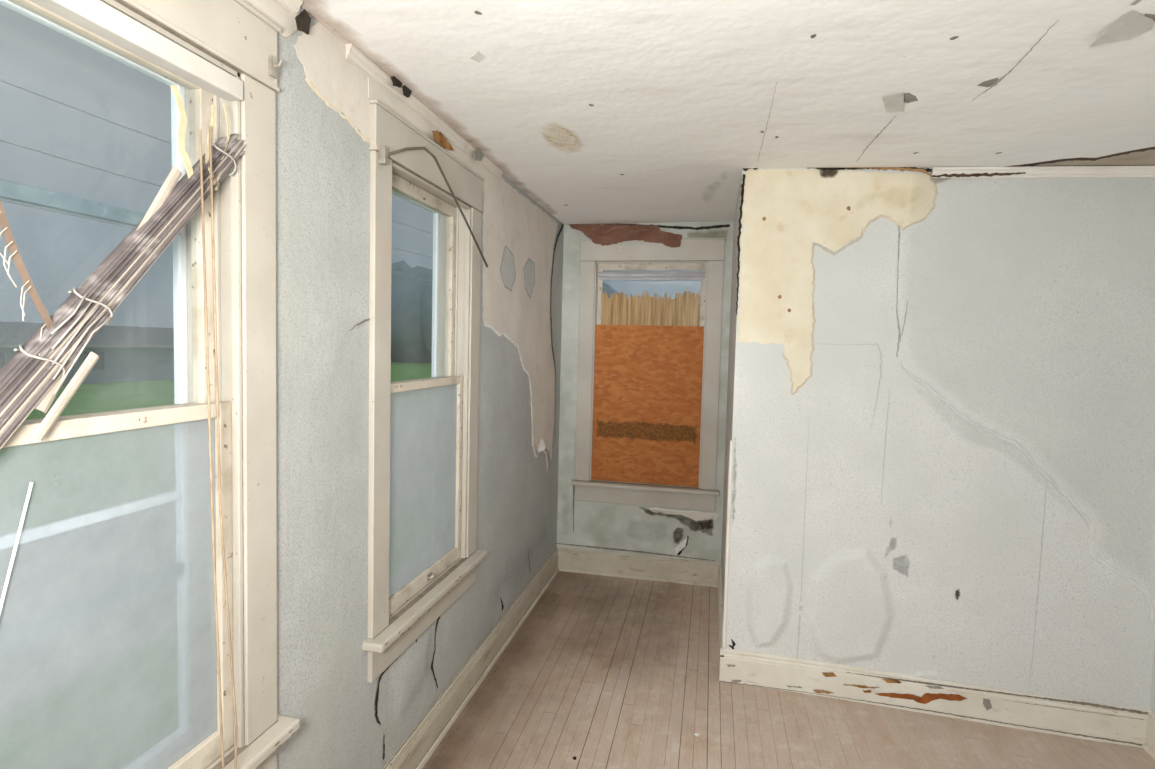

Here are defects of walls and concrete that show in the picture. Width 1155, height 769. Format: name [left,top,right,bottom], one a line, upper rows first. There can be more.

crack [972,20,1059,101]
peeling [1089,10,1155,47]
crack [384,543,714,769]